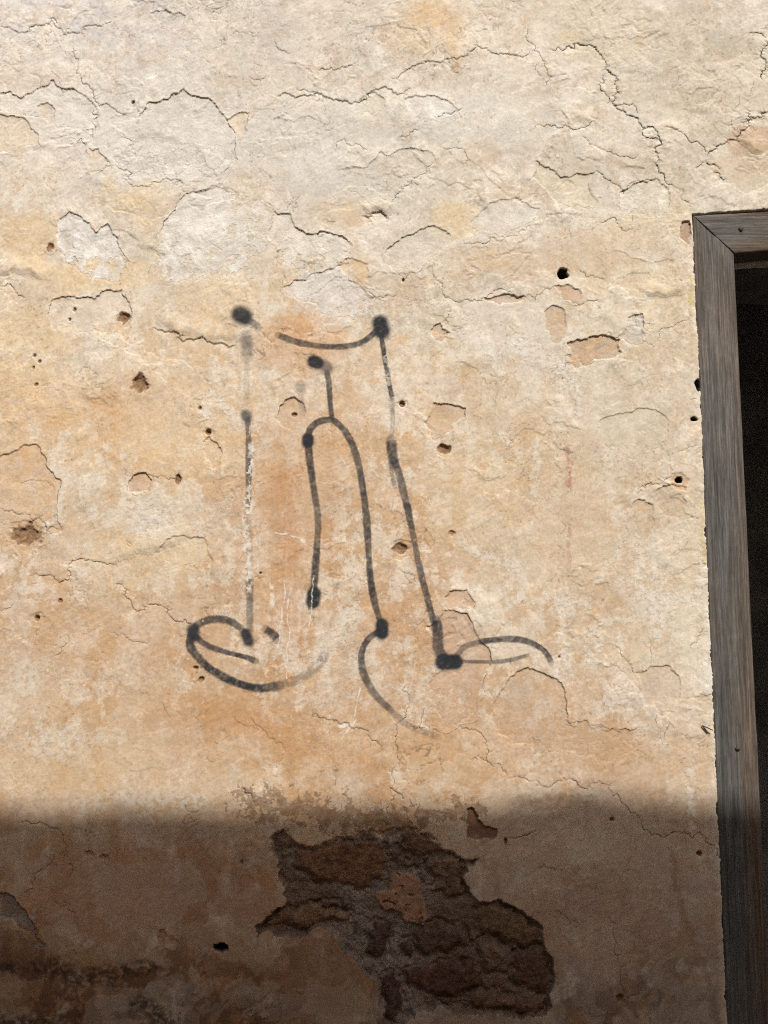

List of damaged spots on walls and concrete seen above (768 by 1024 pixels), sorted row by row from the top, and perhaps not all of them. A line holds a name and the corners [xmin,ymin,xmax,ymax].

crack [1,17,181,187]
crack [256,28,768,231]
spalling [544,269,644,367]
peeling [0,451,63,559]
spalling [229,776,555,1024]